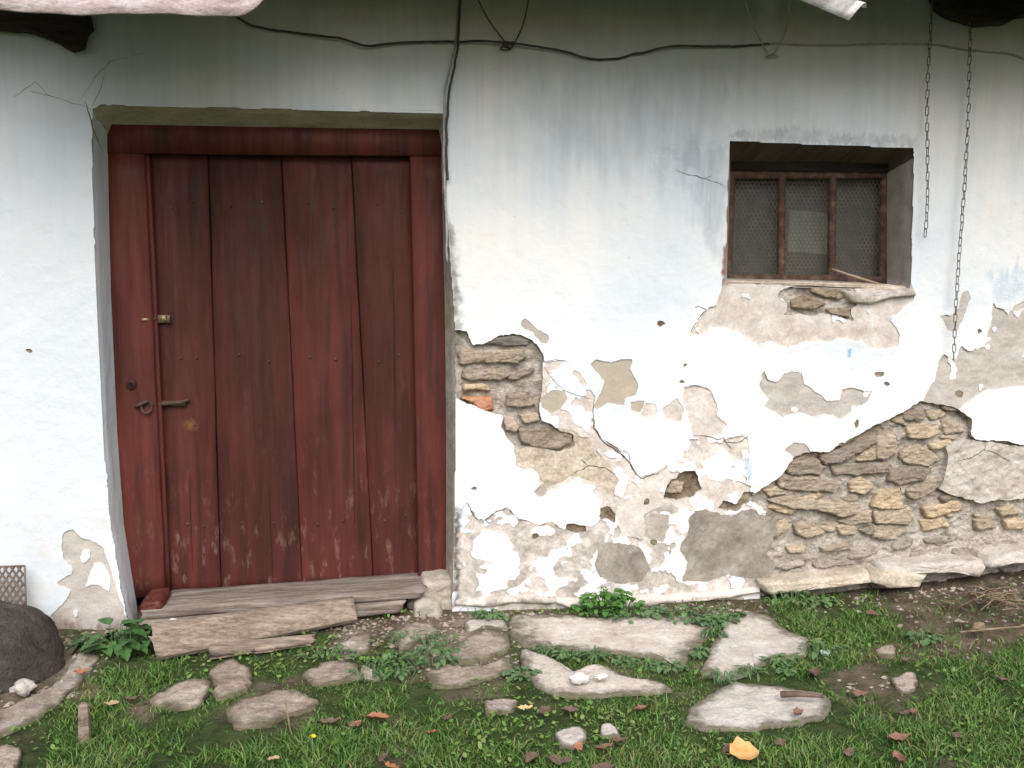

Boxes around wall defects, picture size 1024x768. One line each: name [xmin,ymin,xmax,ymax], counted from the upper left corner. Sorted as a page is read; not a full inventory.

crack [16,53,144,162]
peeling [690,277,913,349]
spalling [452,301,1024,612]
peeling [50,530,130,630]